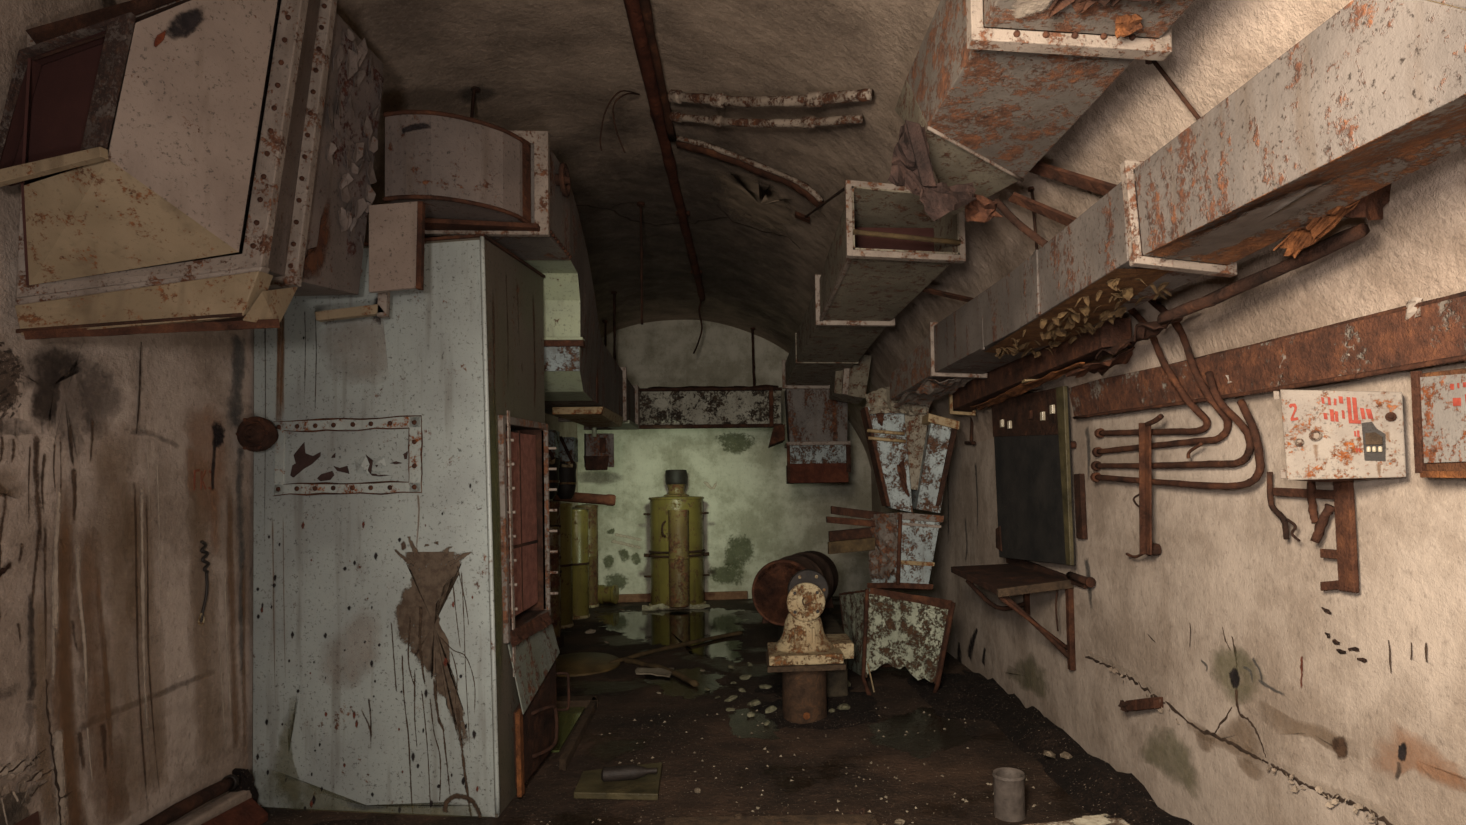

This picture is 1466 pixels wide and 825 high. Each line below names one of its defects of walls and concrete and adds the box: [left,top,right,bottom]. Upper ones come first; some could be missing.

water stain [0,342,94,700]
water stain [133,442,161,786]
water stain [211,338,245,733]
crack [1177,627,1268,764]